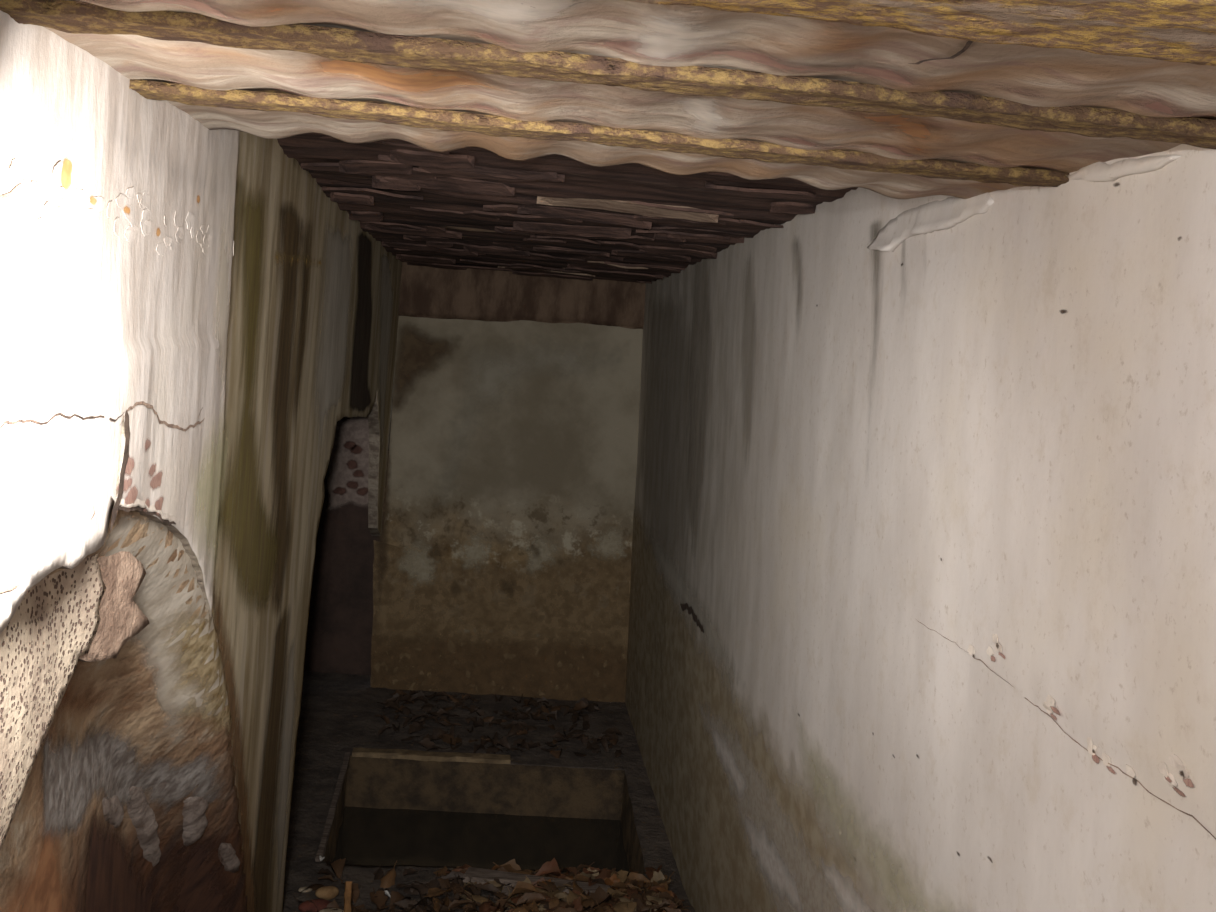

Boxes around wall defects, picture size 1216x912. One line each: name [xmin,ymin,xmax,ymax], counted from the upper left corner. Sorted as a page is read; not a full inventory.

peeling [0,146,214,256]
crack [0,401,205,531]
flaking render [326,416,369,510]
damp [253,207,872,912]
spalling [0,457,248,912]
crack [918,621,1216,839]